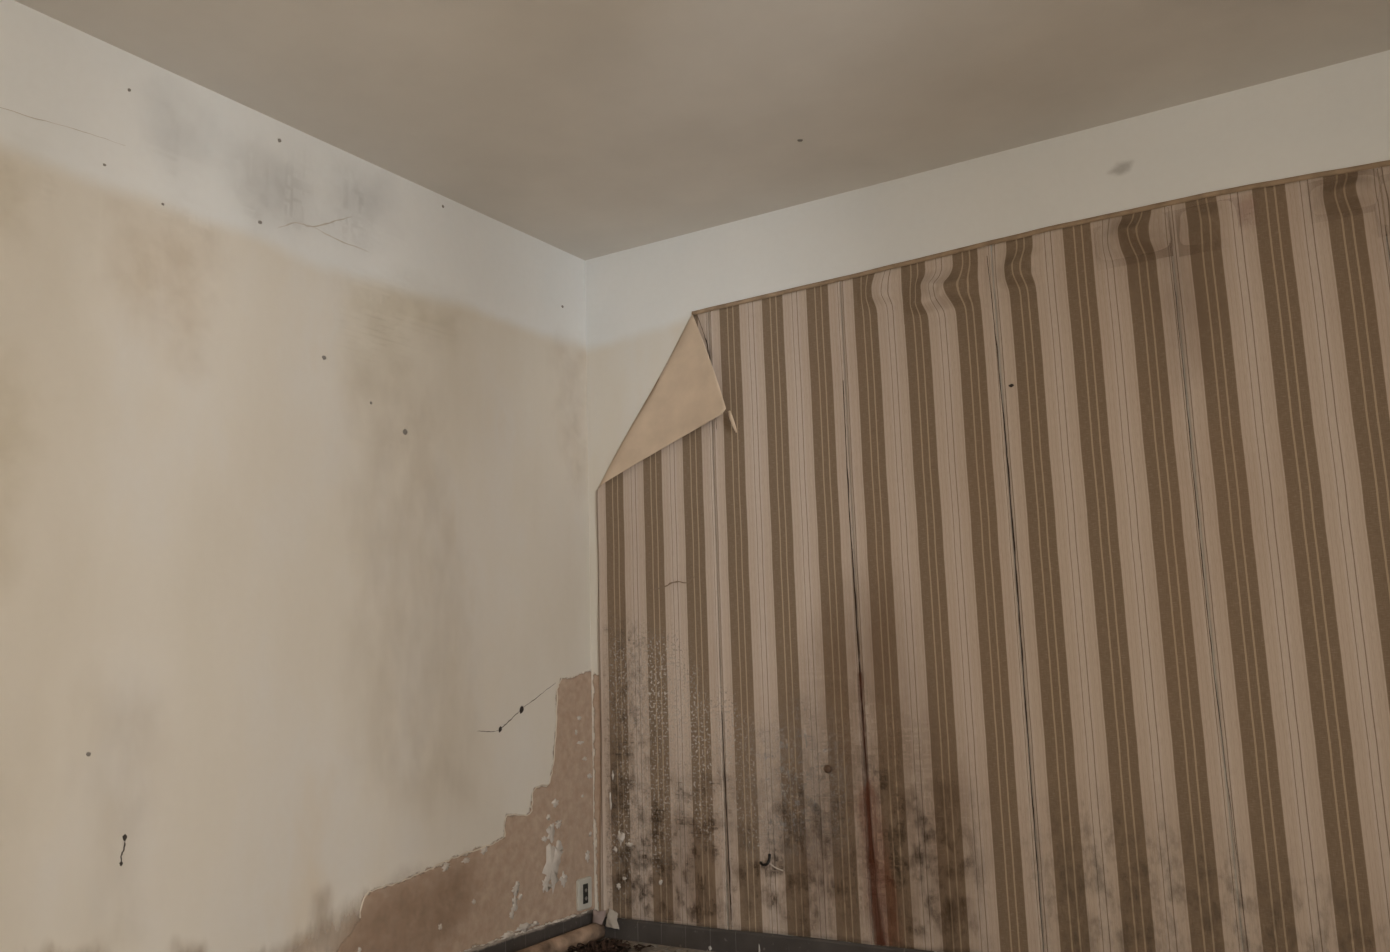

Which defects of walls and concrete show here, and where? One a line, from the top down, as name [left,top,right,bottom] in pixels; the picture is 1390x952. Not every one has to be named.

peeling [598,315,726,488]
peeling [338,671,601,952]
crack [481,684,554,733]
leakage [609,638,846,918]